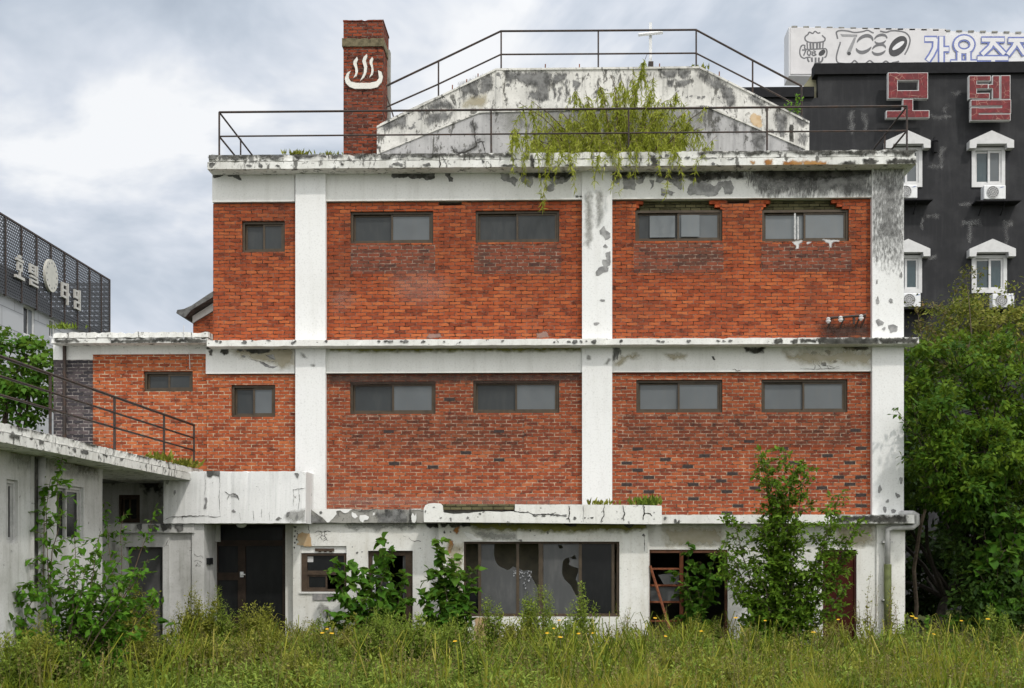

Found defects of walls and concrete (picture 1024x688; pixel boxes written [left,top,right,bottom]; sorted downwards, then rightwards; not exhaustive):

leakage [383,116,406,132]
leakage [419,74,493,125]
leakage [505,70,700,133]
leakage [661,69,737,131]
peeling [209,154,284,181]
peeling [381,154,453,182]
leakage [612,113,916,265]
peeling [596,226,611,276]
peeling [312,509,375,522]
crack [514,505,652,551]